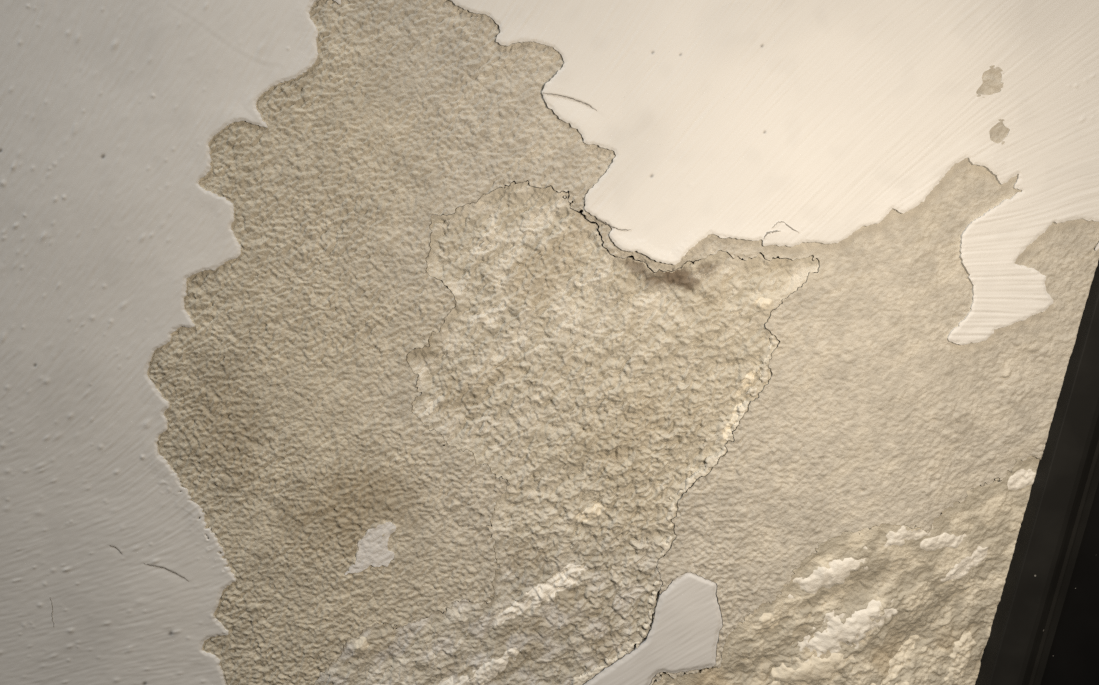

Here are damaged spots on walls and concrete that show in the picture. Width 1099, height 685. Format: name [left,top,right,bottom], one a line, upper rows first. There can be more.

peeling [976,65,1004,97]
peeling [989,119,1009,144]
flaking render [314,181,819,685]
flaking render [652,456,1040,685]